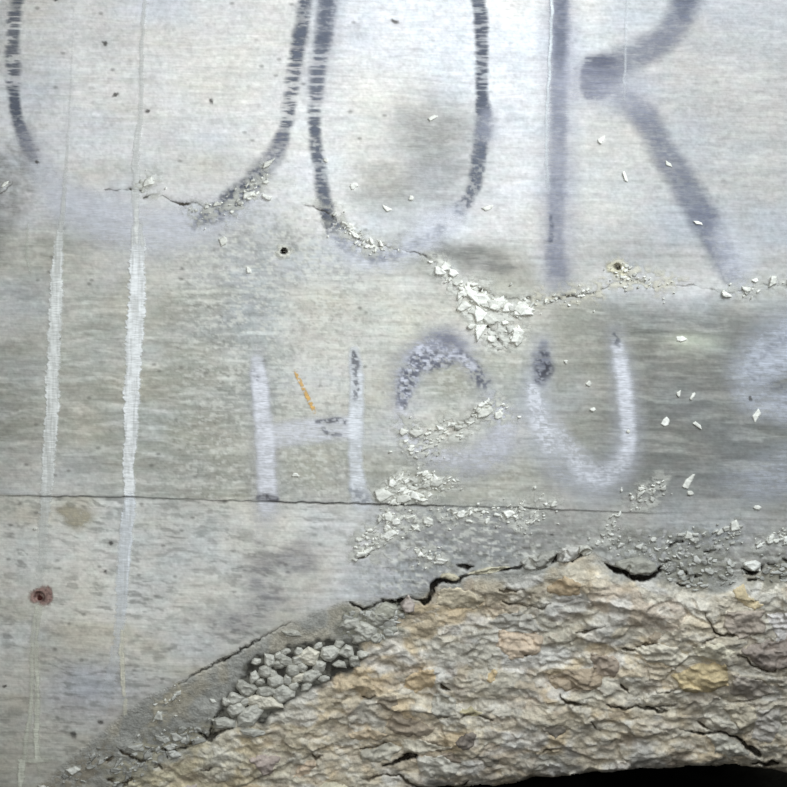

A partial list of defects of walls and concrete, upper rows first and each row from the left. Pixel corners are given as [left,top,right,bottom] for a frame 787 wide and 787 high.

crack [129,188,190,206]
spalling [427,252,681,354]
water stain [39,174,66,553]
water stain [114,1,147,715]
spalling [349,392,562,569]
spalling [38,474,787,787]
crack [350,564,478,611]
crack [604,540,702,586]
crack [741,559,787,581]